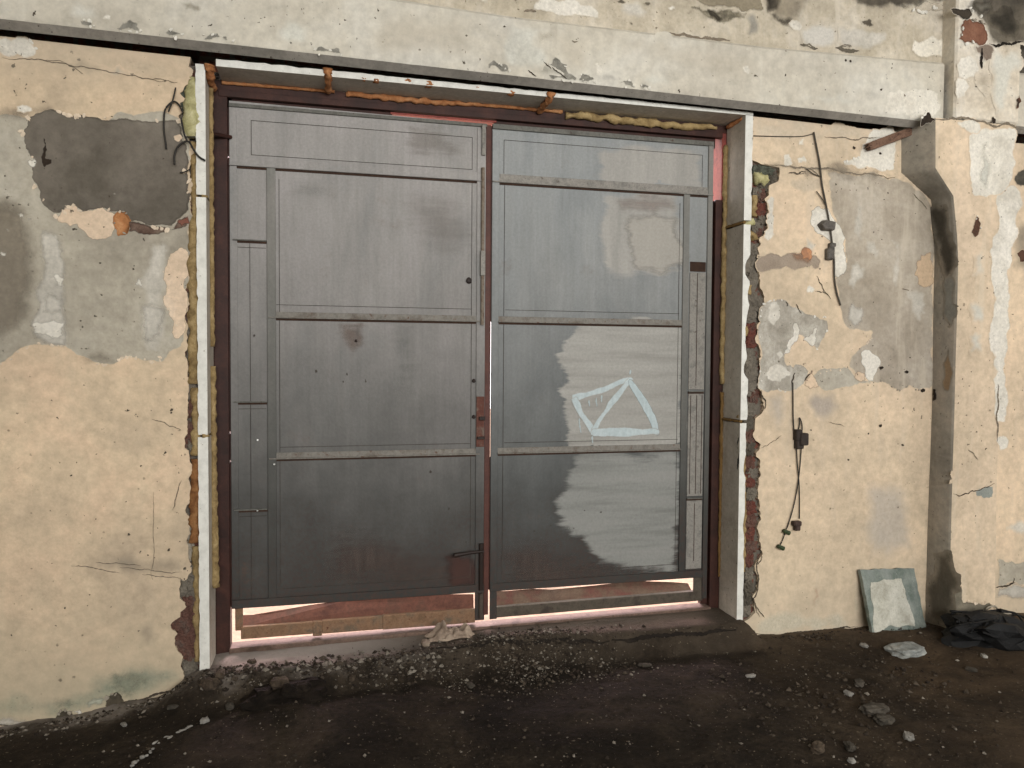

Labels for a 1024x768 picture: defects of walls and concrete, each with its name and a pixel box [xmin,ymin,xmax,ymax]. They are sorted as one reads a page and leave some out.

flaking render [910,2,995,61]
crack [13,53,177,83]
spalling [488,60,511,72]
spalling [548,57,597,84]
flaking render [1014,169,1024,187]
peeling [0,86,193,367]
peeling [742,146,937,617]
flaking render [177,384,197,456]
flaking render [171,527,199,676]